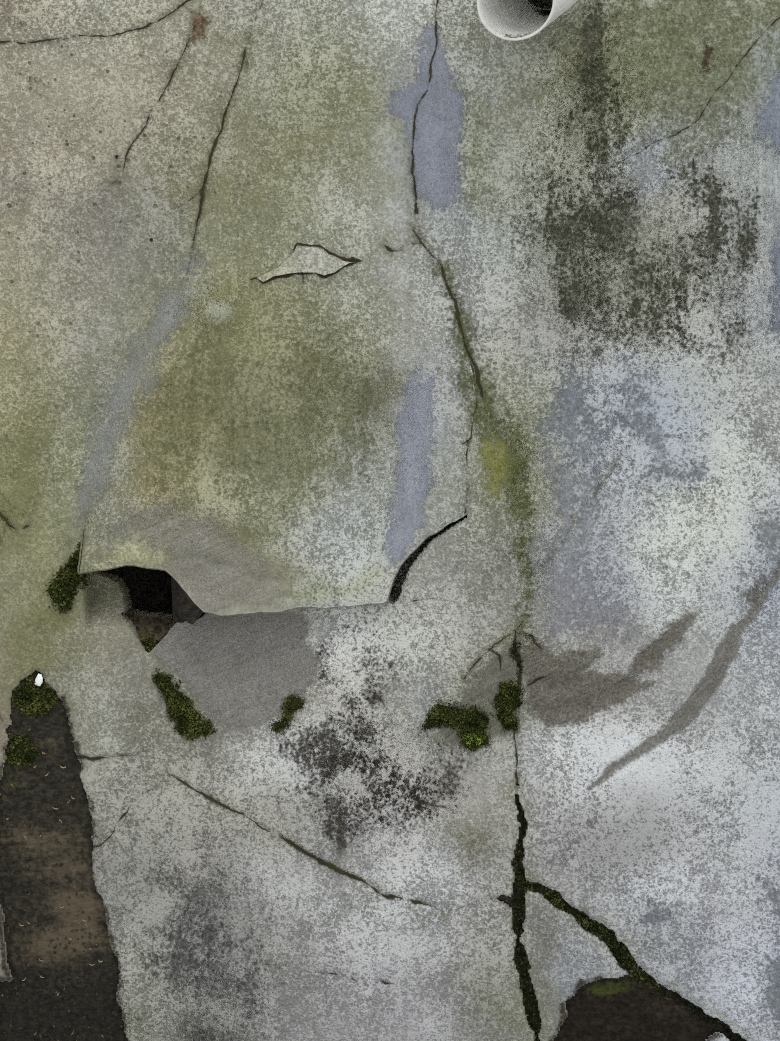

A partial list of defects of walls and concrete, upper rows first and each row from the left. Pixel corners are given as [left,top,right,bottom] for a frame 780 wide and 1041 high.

crack [0,0,196,184]
crack [178,1,263,259]
crack [384,0,483,463]
leakage [511,0,780,363]
crack [623,17,780,161]
crack [0,512,32,529]
spalling [92,504,321,731]
spalling [0,670,128,1041]
crack [93,774,465,910]
crack [464,617,747,1041]
spalling [549,967,723,1041]